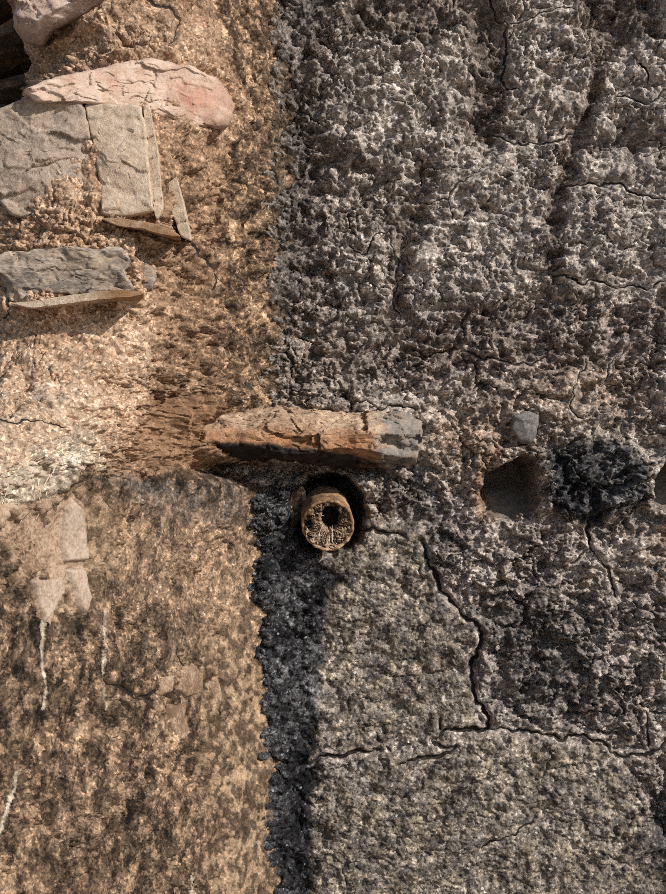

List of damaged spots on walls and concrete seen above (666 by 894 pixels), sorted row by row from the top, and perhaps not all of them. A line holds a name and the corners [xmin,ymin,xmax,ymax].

crack [147,0,181,43]
crack [489,0,576,90]
crack [614,63,666,105]
crack [483,133,576,146]
crack [556,181,666,211]
crack [349,226,401,320]
crack [548,274,664,291]
crack [323,405,416,413]
crack [571,493,616,597]
crack [358,527,666,765]
crack [290,748,381,769]
efflorescence [0,770,20,833]